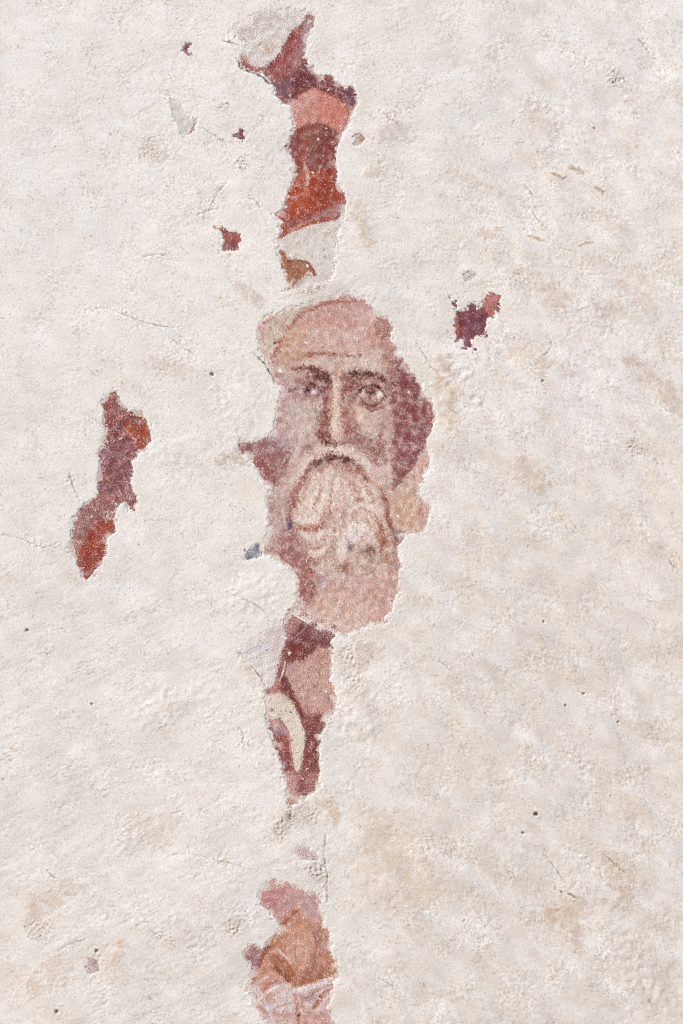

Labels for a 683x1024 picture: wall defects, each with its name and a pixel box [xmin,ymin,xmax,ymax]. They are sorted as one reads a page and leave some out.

peeling [220,5,437,1024]